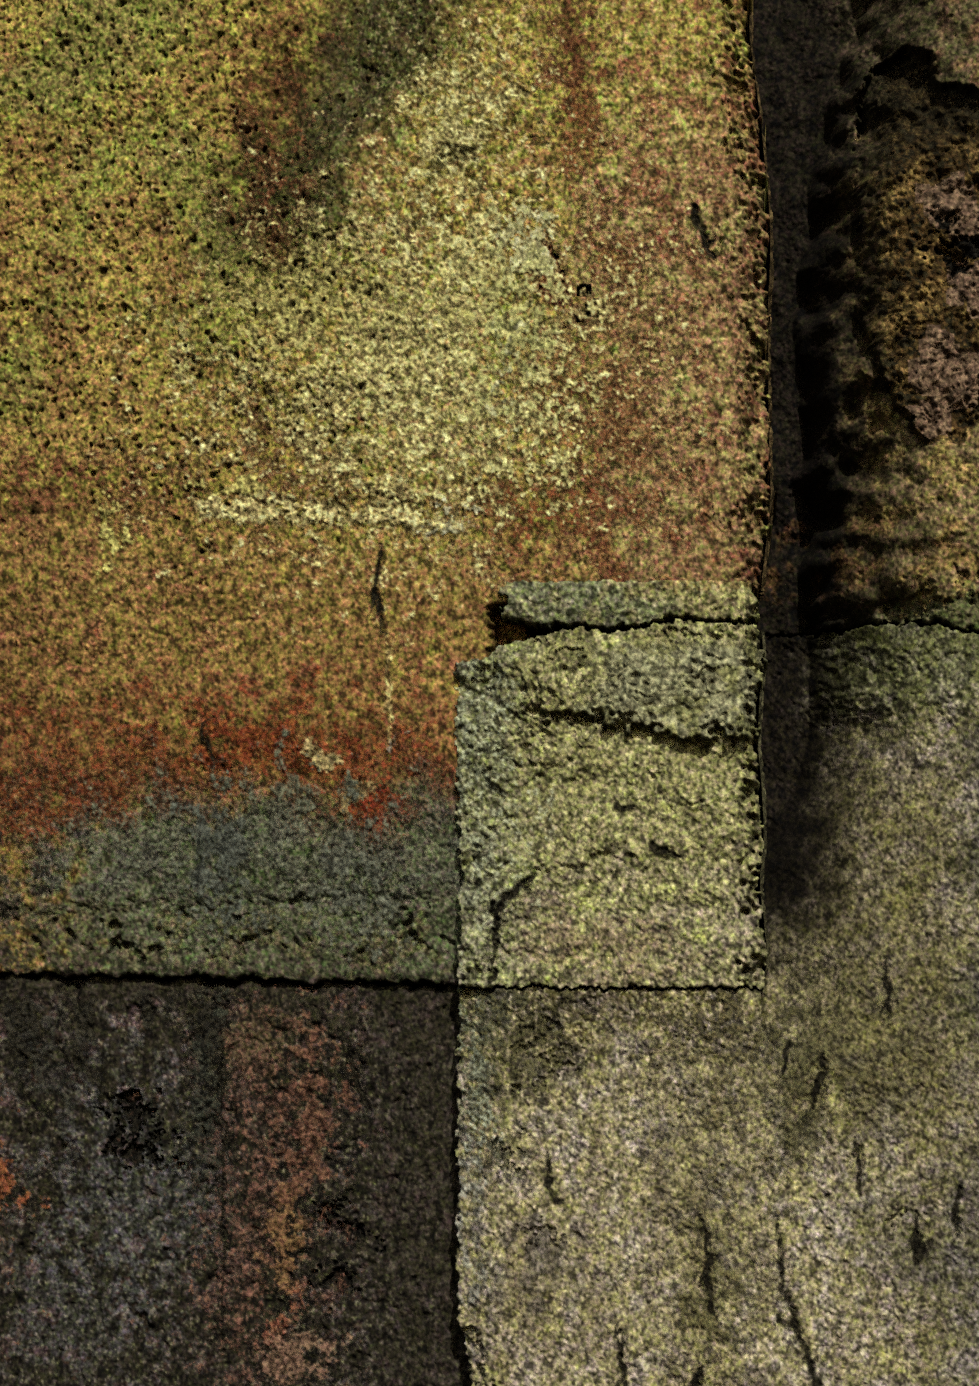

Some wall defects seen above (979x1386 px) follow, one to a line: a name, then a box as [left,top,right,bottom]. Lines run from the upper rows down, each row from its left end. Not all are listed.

rust [0,657,460,846]
rust [0,1137,50,1210]
rust [183,999,361,1386]